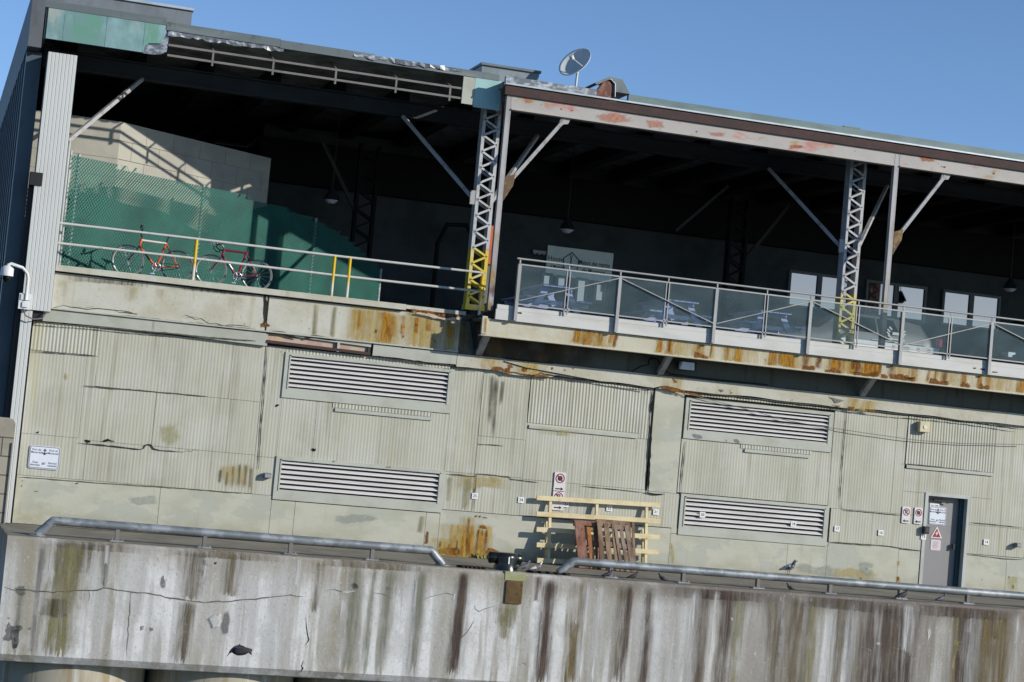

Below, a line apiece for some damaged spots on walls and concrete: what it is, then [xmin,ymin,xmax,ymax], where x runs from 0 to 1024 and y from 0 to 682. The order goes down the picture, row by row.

corrosion [267,306,461,355]
corrosion [488,358,574,378]
corrosion [662,378,702,397]
corrosion [769,352,1003,390]
corrosion [420,505,499,557]
crack [5,579,353,653]
water stain [178,548,252,663]
water stain [338,559,403,666]
water stain [407,575,425,670]
water stain [614,589,632,678]
water stain [640,594,651,682]
water stain [768,598,866,682]